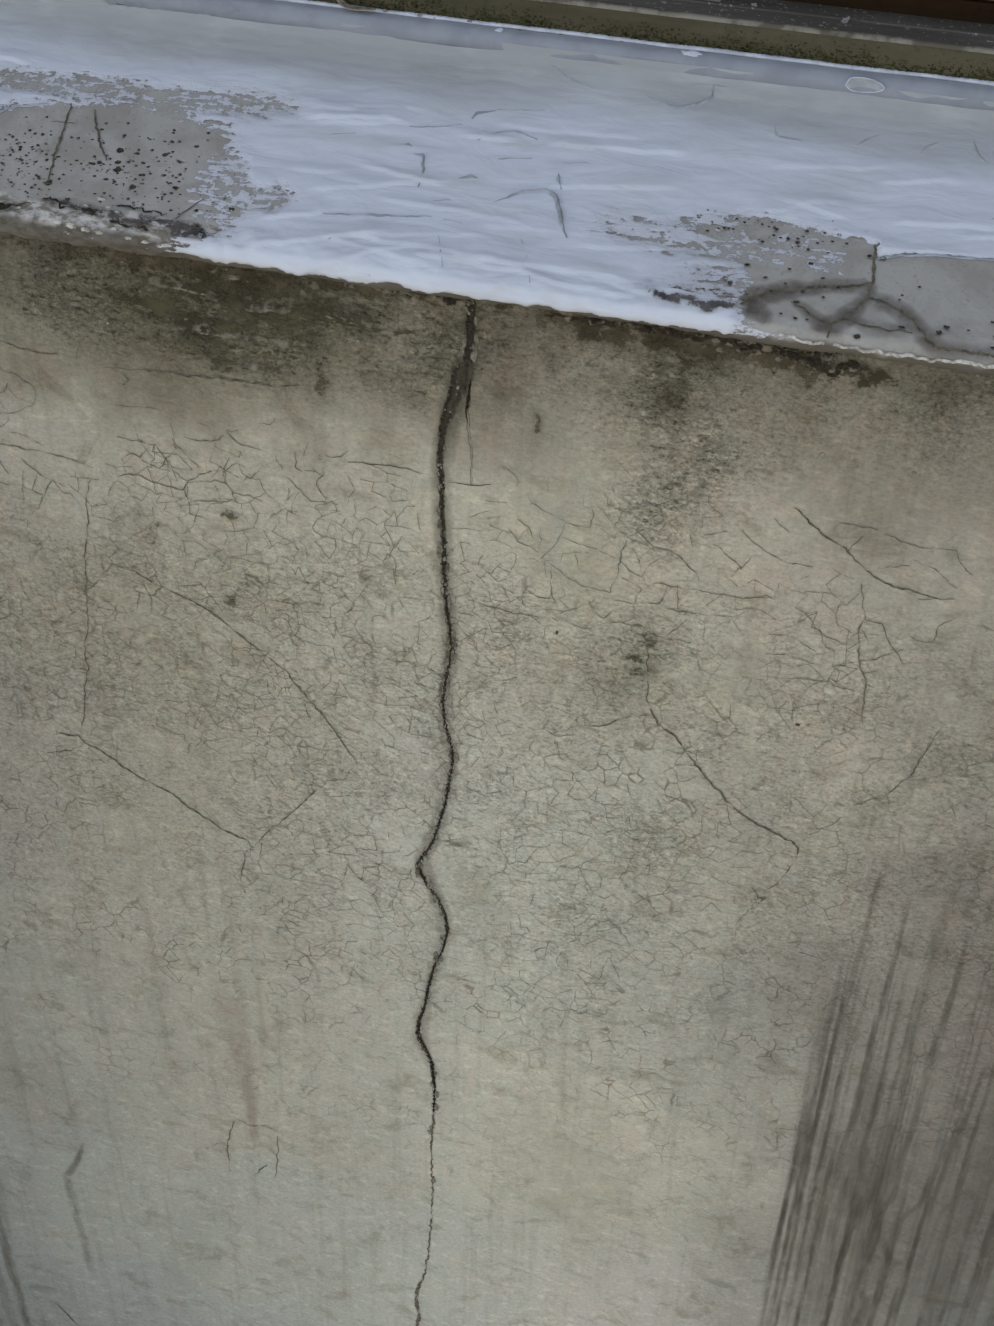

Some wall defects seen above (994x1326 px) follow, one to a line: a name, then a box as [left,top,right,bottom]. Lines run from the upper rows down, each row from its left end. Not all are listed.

spalling [0,116,235,247]
spalling [697,209,848,298]
spalling [434,295,467,308]
spalling [544,310,994,377]
crack [0,299,972,1326]